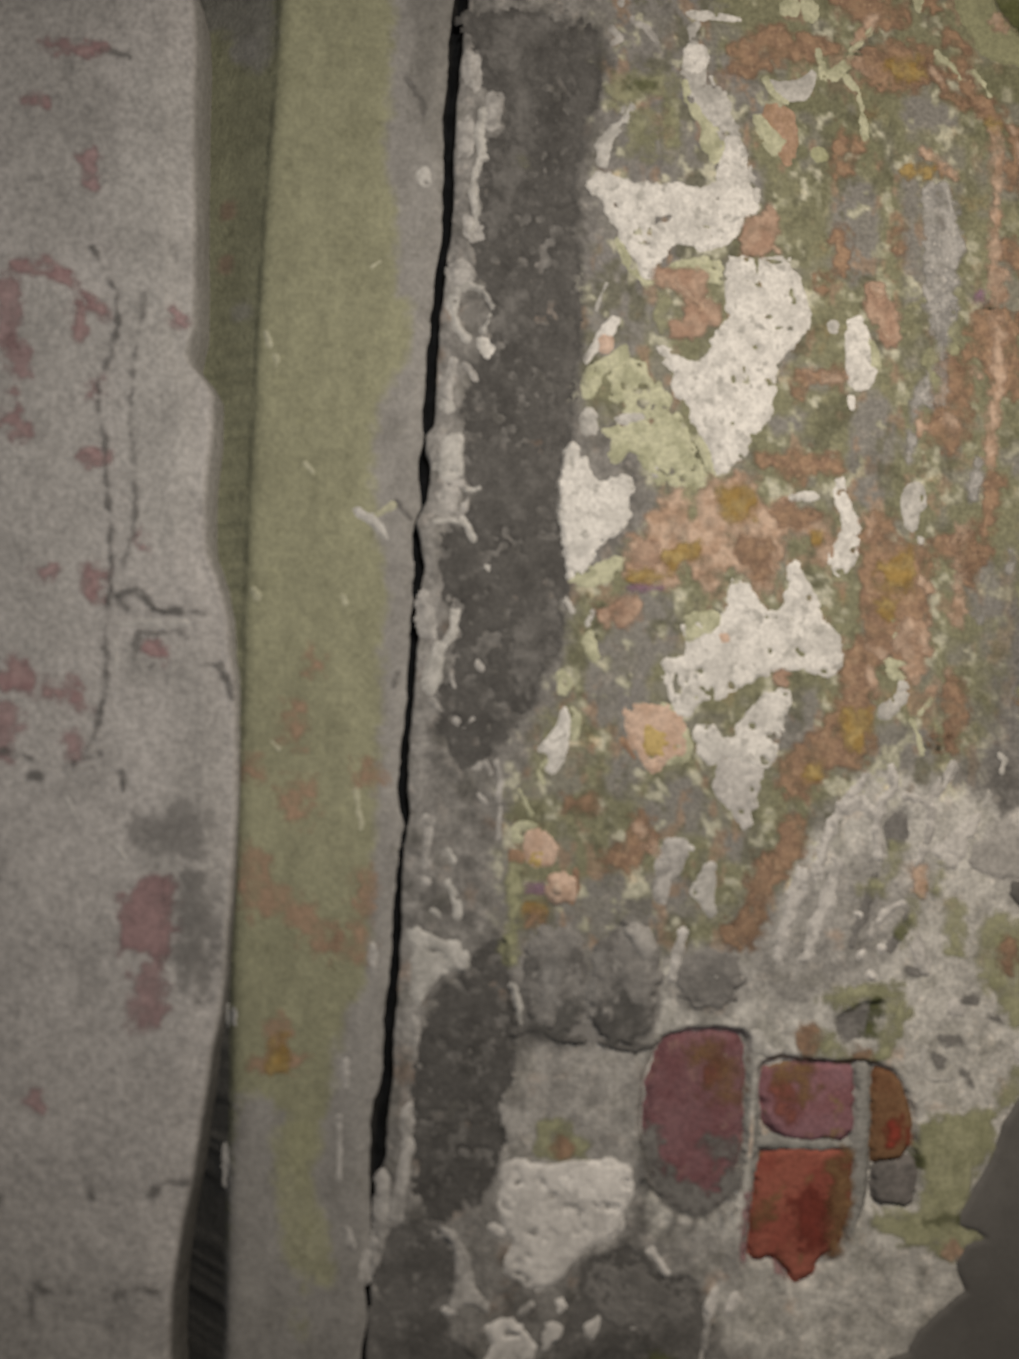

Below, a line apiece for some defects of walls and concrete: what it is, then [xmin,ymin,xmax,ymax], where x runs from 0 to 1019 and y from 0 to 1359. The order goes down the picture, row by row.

peeling [933,0,1019,98]
crack [73,245,197,790]
spalling [414,7,882,868]
corrosion [720,14,1019,952]
peeling [900,481,927,545]
crack [369,0,468,1234]
crack [214,662,234,699]
peeling [877,657,935,756]
spalling [344,760,1019,1359]
corrosion [796,1023,820,1061]
corrosion [851,1049,875,1063]
crack [361,1283,371,1359]